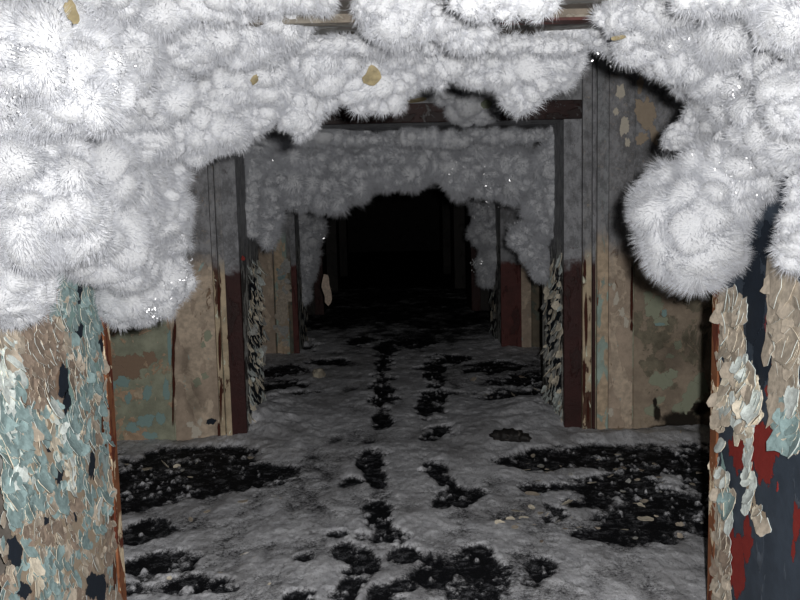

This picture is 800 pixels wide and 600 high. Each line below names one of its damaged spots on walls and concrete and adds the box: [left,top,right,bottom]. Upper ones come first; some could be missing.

spalling [613,75,660,147]
peeling [0,270,158,600]
peeling [241,256,292,430]
peeling [534,253,563,422]
peeling [643,291,669,326]
peeling [644,368,678,417]
peeling [672,220,800,600]